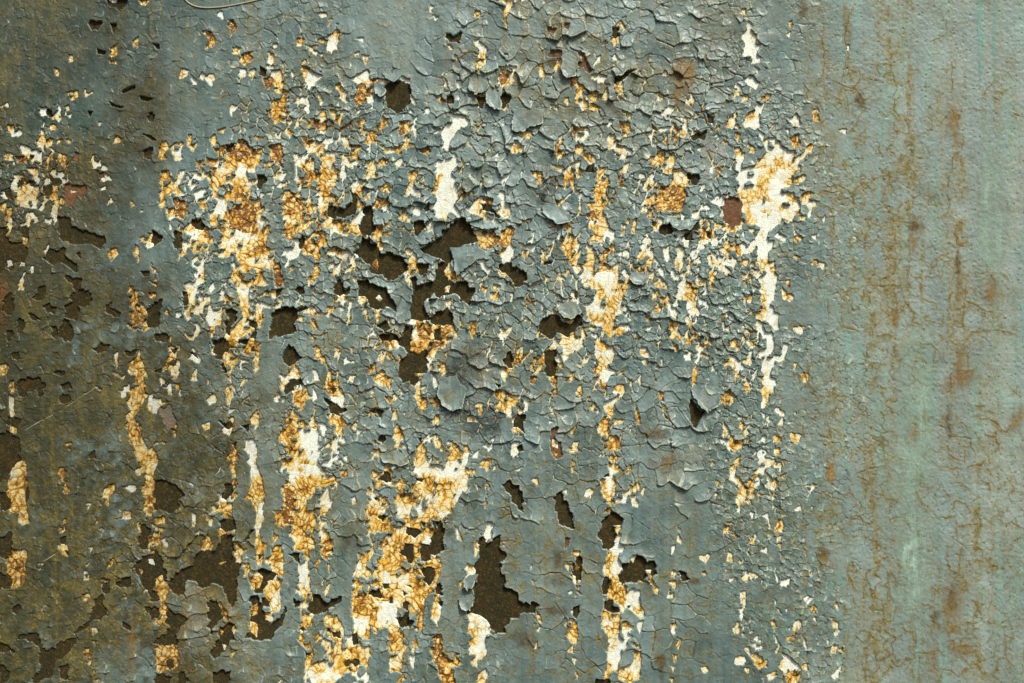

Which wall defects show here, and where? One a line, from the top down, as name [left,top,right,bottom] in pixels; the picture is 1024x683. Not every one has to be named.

peeling [107,0,150,10]
peeling [499,0,525,37]
peeling [0,9,826,683]